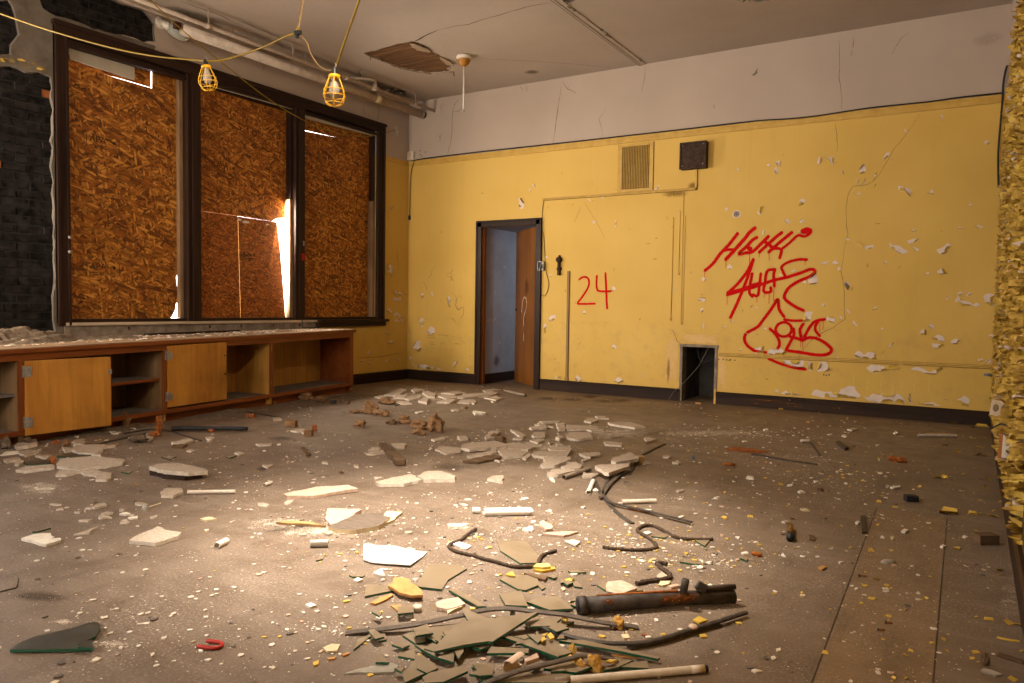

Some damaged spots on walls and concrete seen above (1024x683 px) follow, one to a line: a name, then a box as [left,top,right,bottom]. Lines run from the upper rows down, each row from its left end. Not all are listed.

flaking render [364,41,455,76]
flaking render [0,0,56,332]
peeling [883,229,919,264]
peeling [779,260,841,285]
peeling [802,303,857,326]
peeling [385,291,469,371]
peeling [920,324,960,348]
peeling [739,346,838,372]
peeling [854,351,944,374]